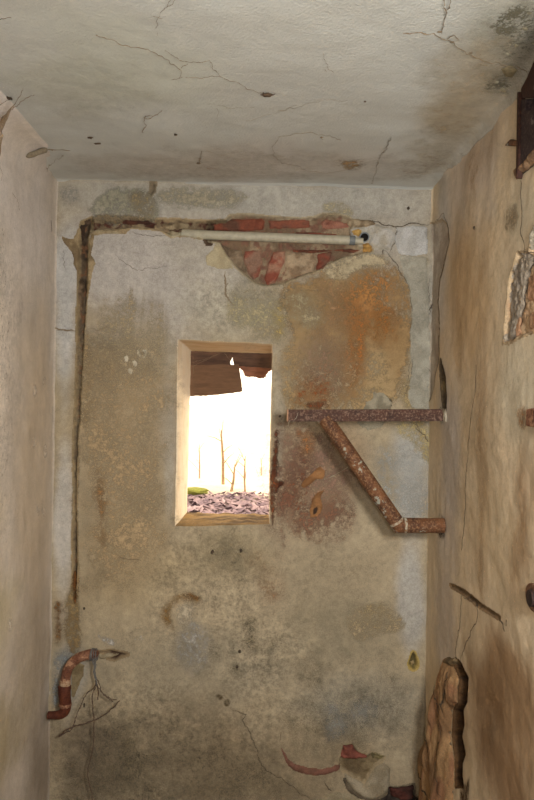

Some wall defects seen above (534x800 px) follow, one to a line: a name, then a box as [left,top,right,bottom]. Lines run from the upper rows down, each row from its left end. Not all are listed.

water stain [490,5,534,59]
spalling [203,212,375,287]
rust [279,253,412,409]
spalling [502,225,534,346]
rust [268,421,355,546]
spalling [281,743,419,800]